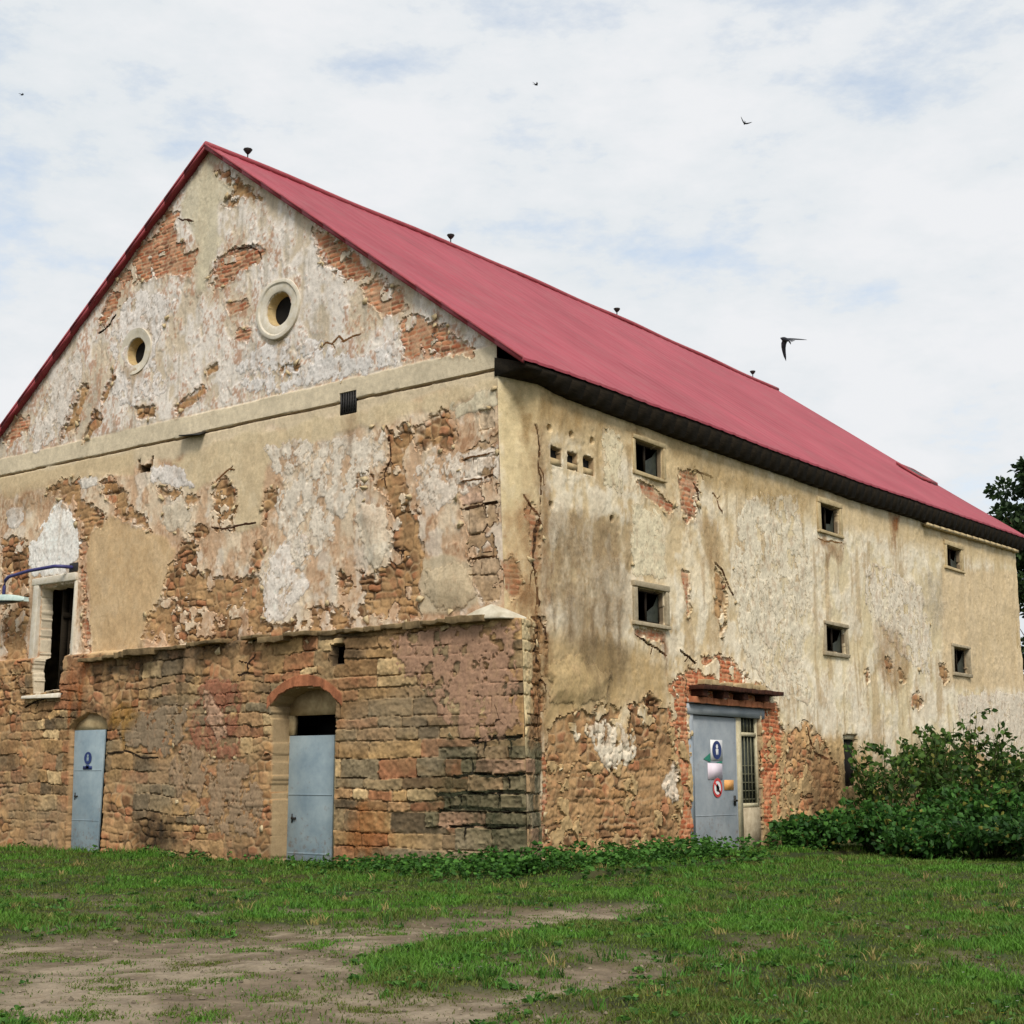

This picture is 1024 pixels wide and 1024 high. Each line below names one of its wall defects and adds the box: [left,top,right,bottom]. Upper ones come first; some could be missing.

flaking render [2,211,199,453]
flaking render [205,245,265,293]
crack [320,334,361,348]
flaking render [235,227,475,395]
flaking render [0,474,153,718]
flaking render [142,386,842,859]
crack [437,424,547,840]
leakage [535,517,621,627]
crack [635,634,696,664]